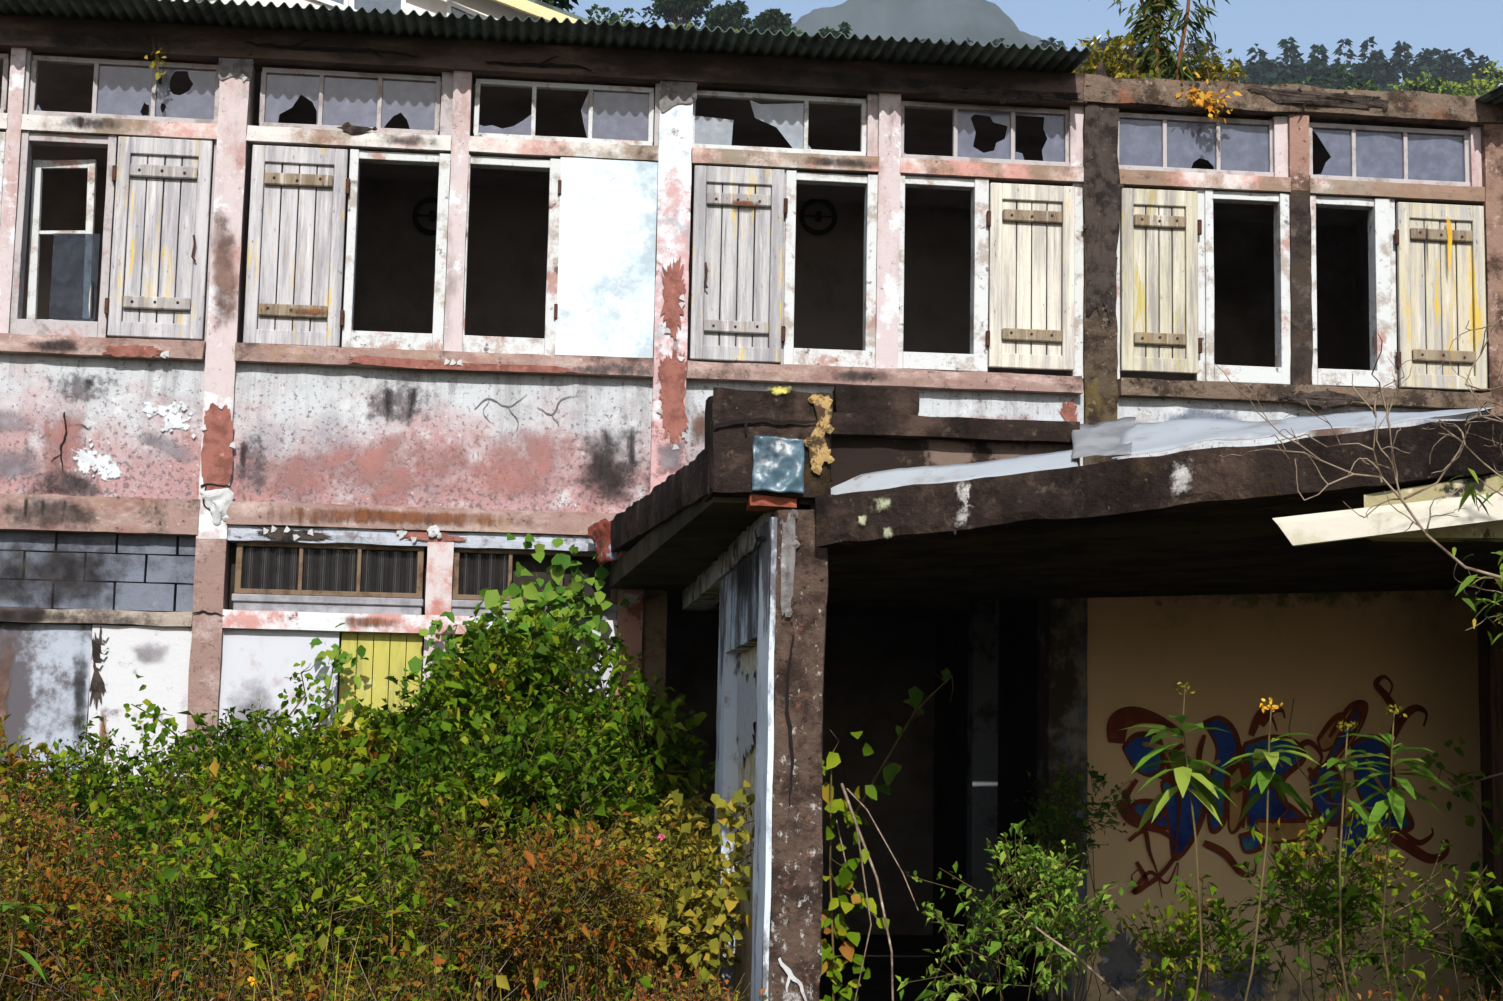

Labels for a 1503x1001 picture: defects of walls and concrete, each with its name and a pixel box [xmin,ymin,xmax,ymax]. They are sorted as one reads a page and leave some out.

peeling [656,257,689,450]
crack [51,412,88,471]
peeling [70,438,125,481]
peeling [138,401,236,525]
leakage [238,379,638,504]
leakage [659,414,705,469]
peeling [736,666,757,767]